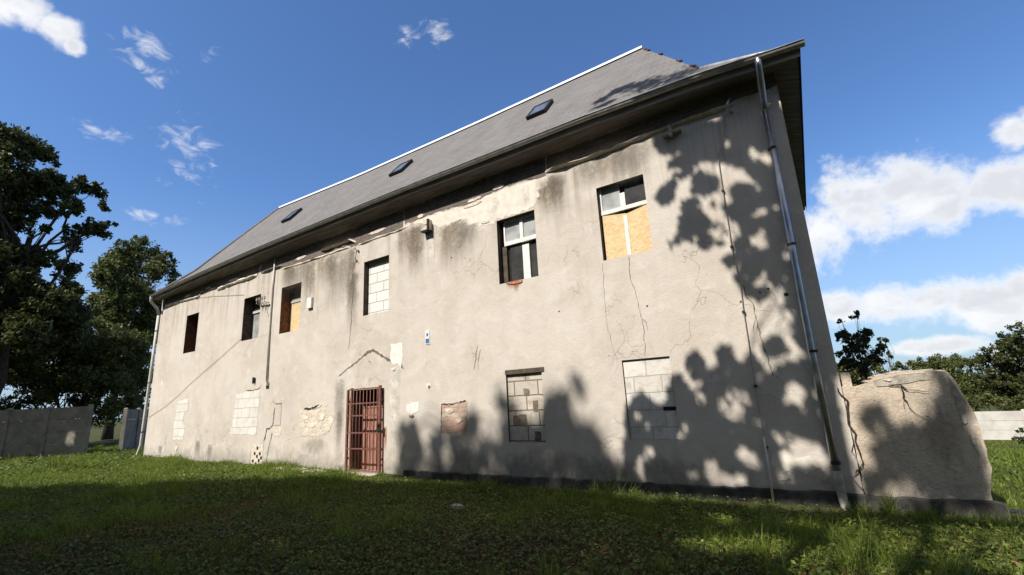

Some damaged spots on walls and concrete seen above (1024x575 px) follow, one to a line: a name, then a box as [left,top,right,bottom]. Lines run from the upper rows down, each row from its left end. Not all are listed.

spalling [163,73,777,308]
crack [339,248,404,376]
spalling [299,404,335,438]
spalling [441,402,468,434]
crack [837,387,866,494]
crack [892,379,929,418]